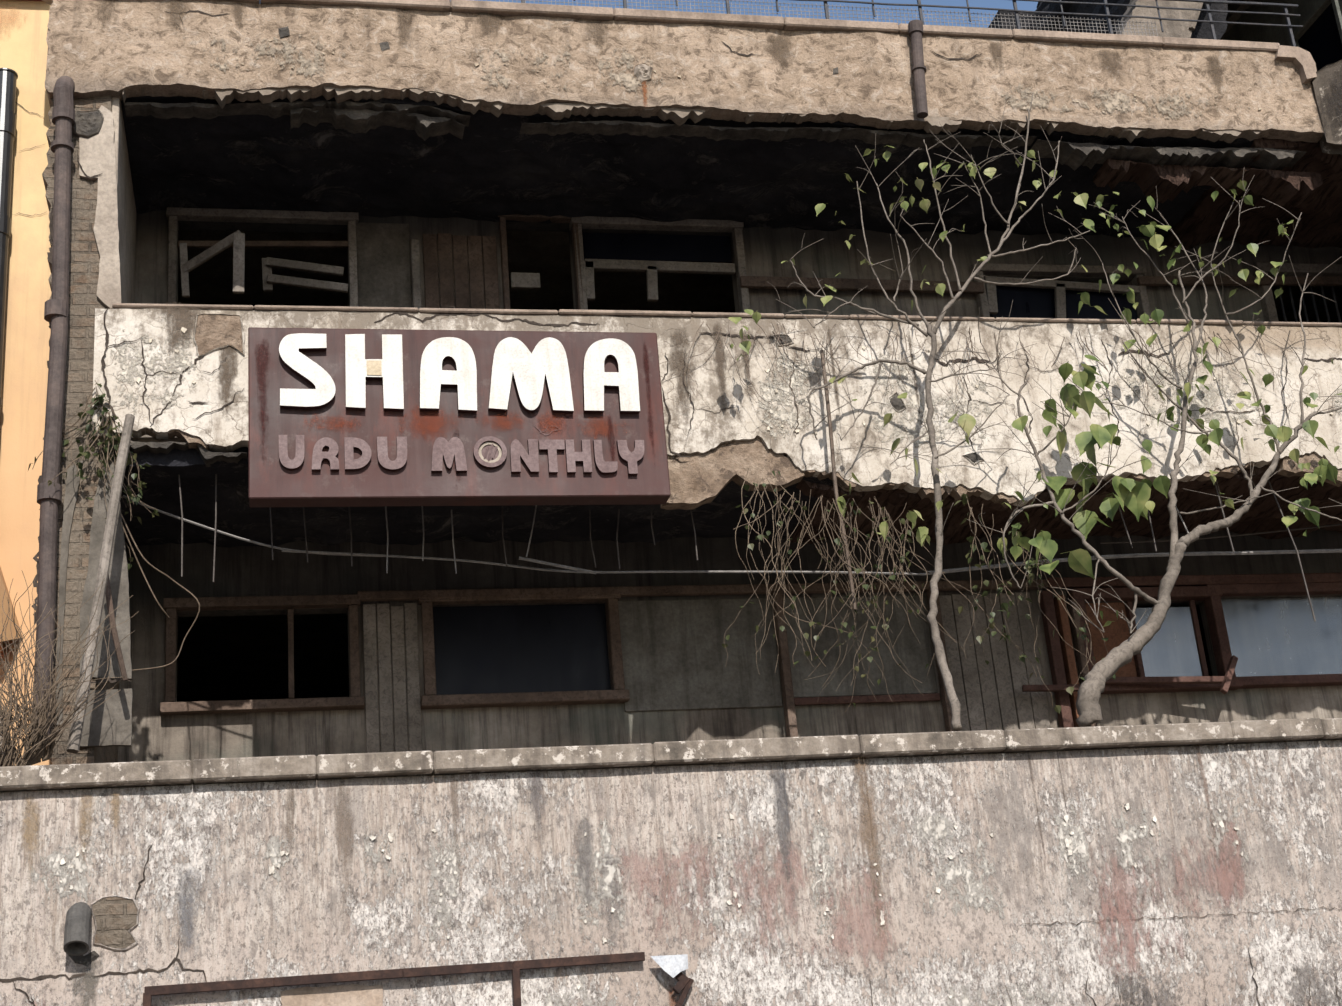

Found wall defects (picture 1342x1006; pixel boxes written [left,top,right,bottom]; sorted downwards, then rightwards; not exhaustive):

crack [101,309,244,430]
crack [1192,348,1342,446]
flaking render [651,334,1342,622]
flaking render [30,843,140,966]
crack [135,844,153,899]
crack [0,939,207,1006]
flaking render [280,984,383,1006]